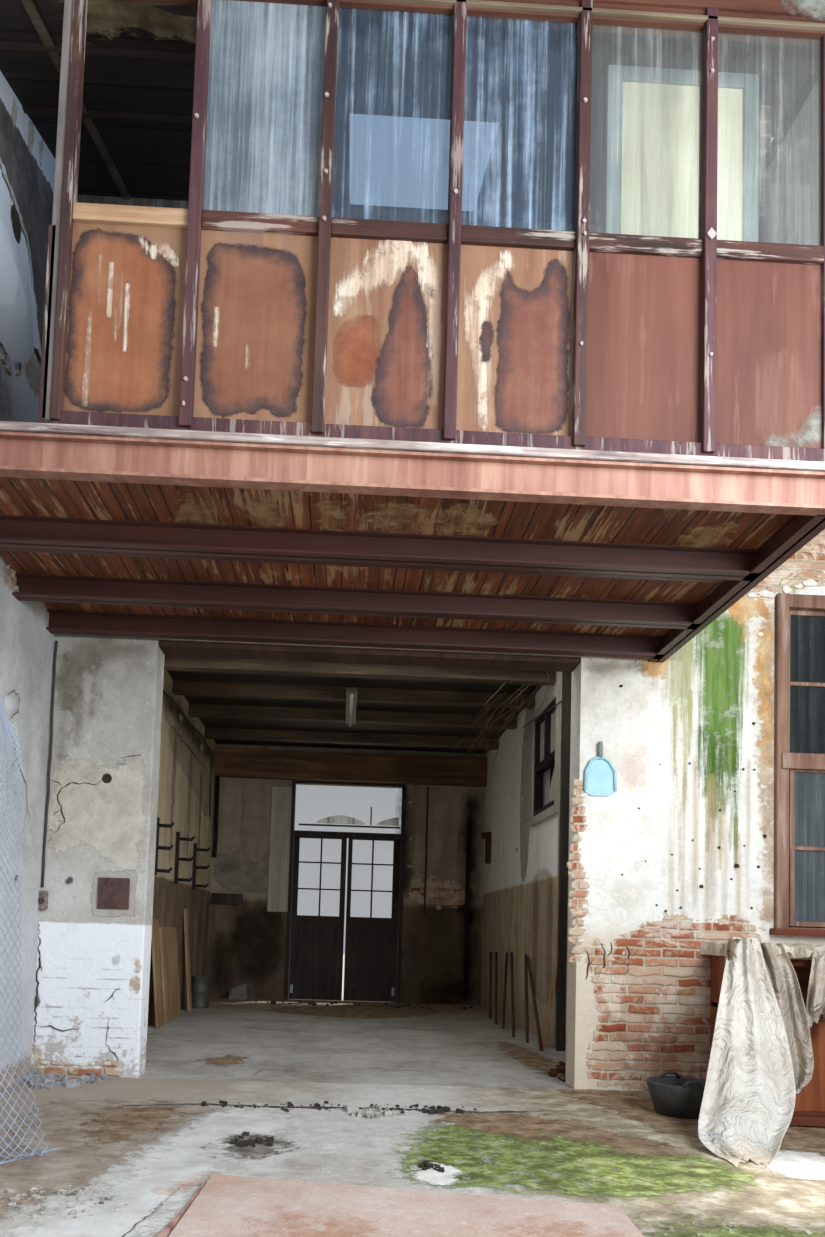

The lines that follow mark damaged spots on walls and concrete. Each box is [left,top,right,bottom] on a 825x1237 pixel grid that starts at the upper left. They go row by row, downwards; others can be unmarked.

spalling [0,98,53,394]
peeling [367,503,495,536]
peeling [680,522,734,548]
crack [8,728,139,843]
spalling [567,529,825,1091]